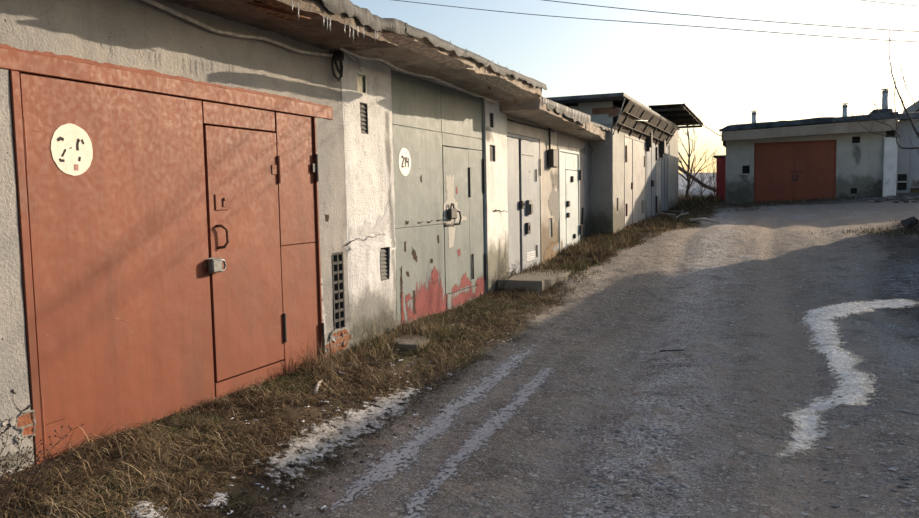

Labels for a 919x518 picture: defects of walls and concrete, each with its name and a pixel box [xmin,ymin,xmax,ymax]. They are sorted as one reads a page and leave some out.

peeling [321,278,389,360]
peeling [401,266,485,324]